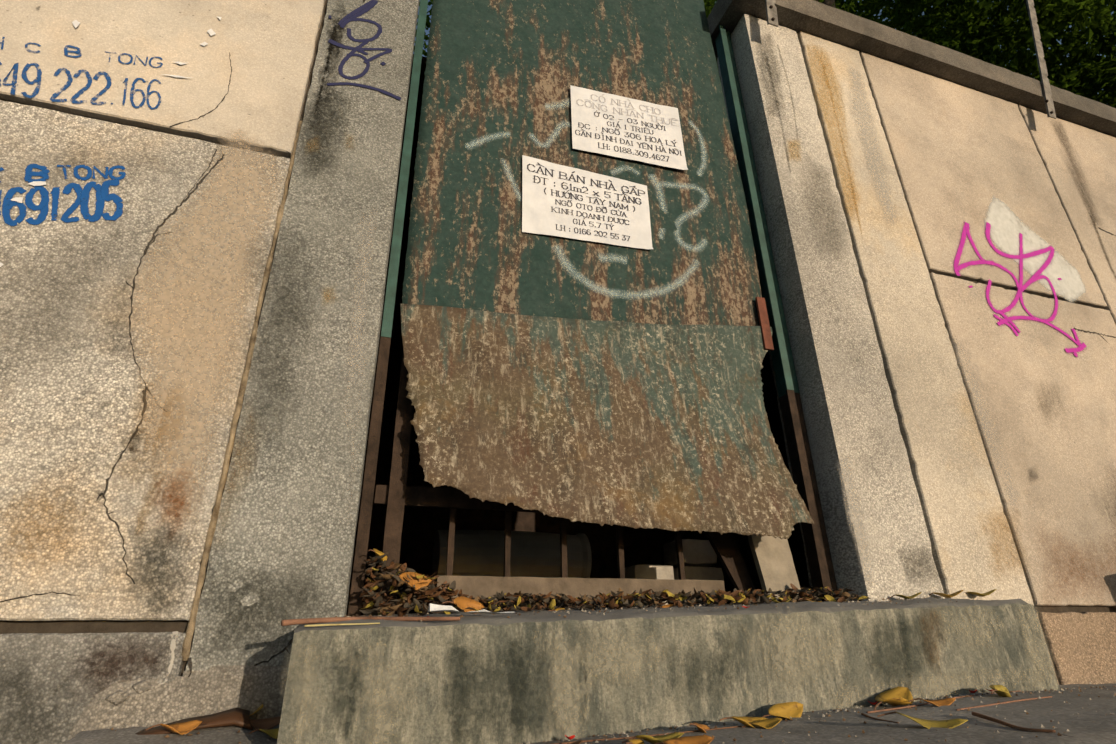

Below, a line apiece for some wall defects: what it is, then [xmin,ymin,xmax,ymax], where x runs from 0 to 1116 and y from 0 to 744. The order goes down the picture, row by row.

crack [169,52,232,127]
leakage [317,23,343,105]
crack [97,149,225,584]
crack [0,591,79,602]